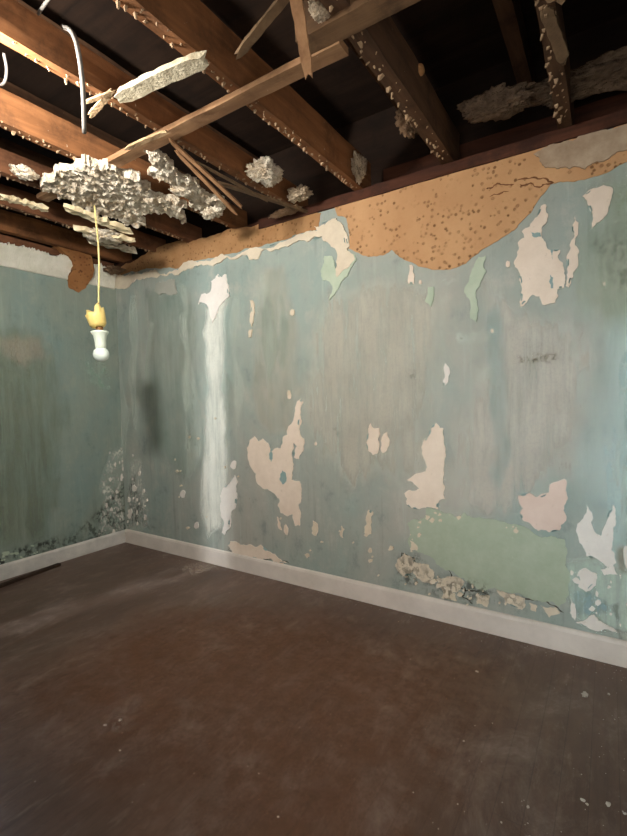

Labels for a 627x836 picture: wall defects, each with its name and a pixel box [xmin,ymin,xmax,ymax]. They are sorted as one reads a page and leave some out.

flaking render [115,124,627,323]
crack [486,176,554,197]
damp [0,333,146,557]
peeling [220,460,286,564]
peeling [247,390,317,535]
peeling [364,510,373,537]
peeling [395,423,627,633]